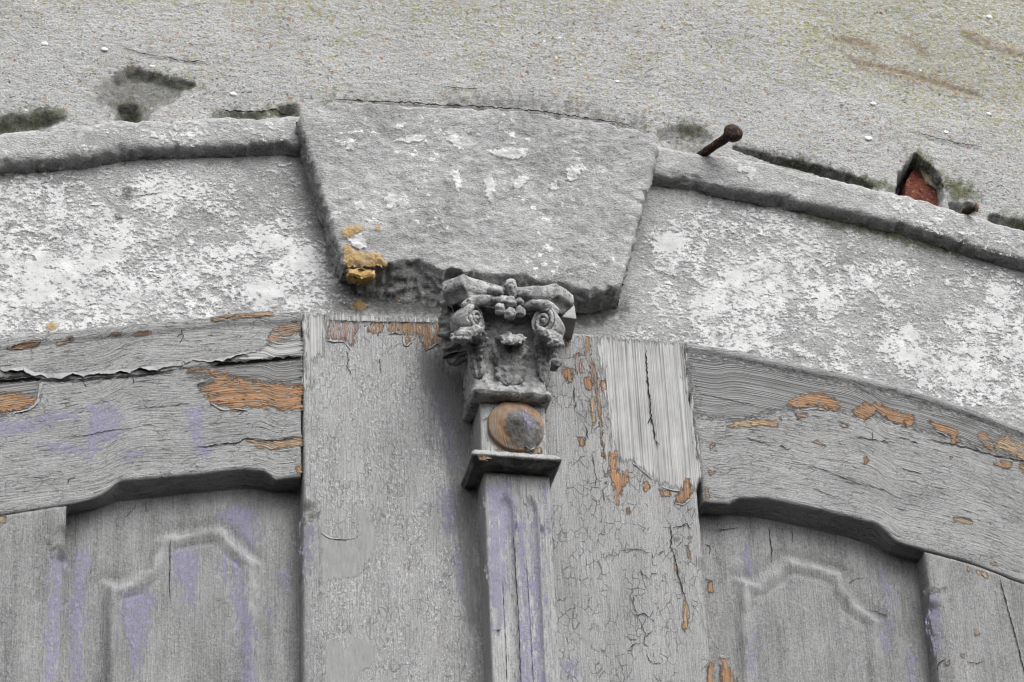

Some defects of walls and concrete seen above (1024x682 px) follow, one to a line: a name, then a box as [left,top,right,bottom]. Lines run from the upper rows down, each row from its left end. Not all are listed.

flaking render [733,143,1023,254]
peeling [0,160,441,417]
peeling [246,435,304,450]
crack [573,388,606,504]
crack [645,350,659,449]
peeling [561,196,1024,514]
crack [621,523,738,664]